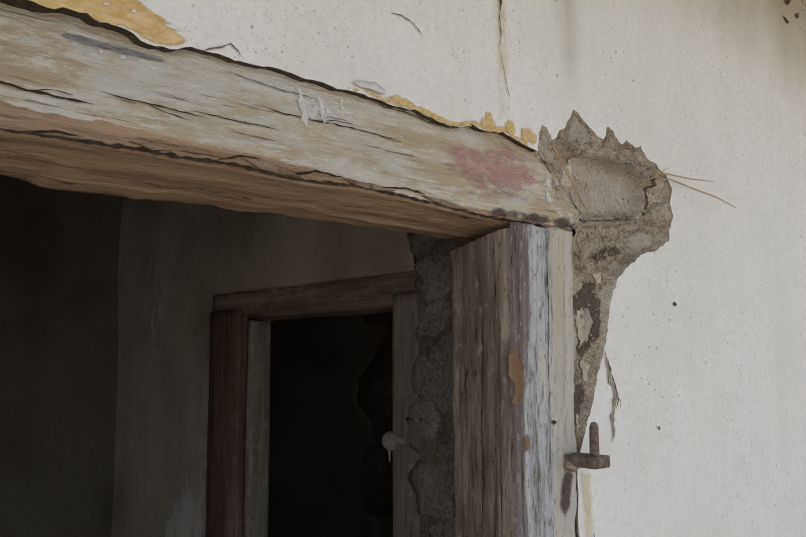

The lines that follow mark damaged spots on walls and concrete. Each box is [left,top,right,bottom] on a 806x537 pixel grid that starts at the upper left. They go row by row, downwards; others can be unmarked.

peeling [31,0,185,45]
spalling [62,33,164,62]
crack [499,0,510,96]
flaking render [353,80,672,443]
crack [536,427,552,498]
crack [575,485,595,537]